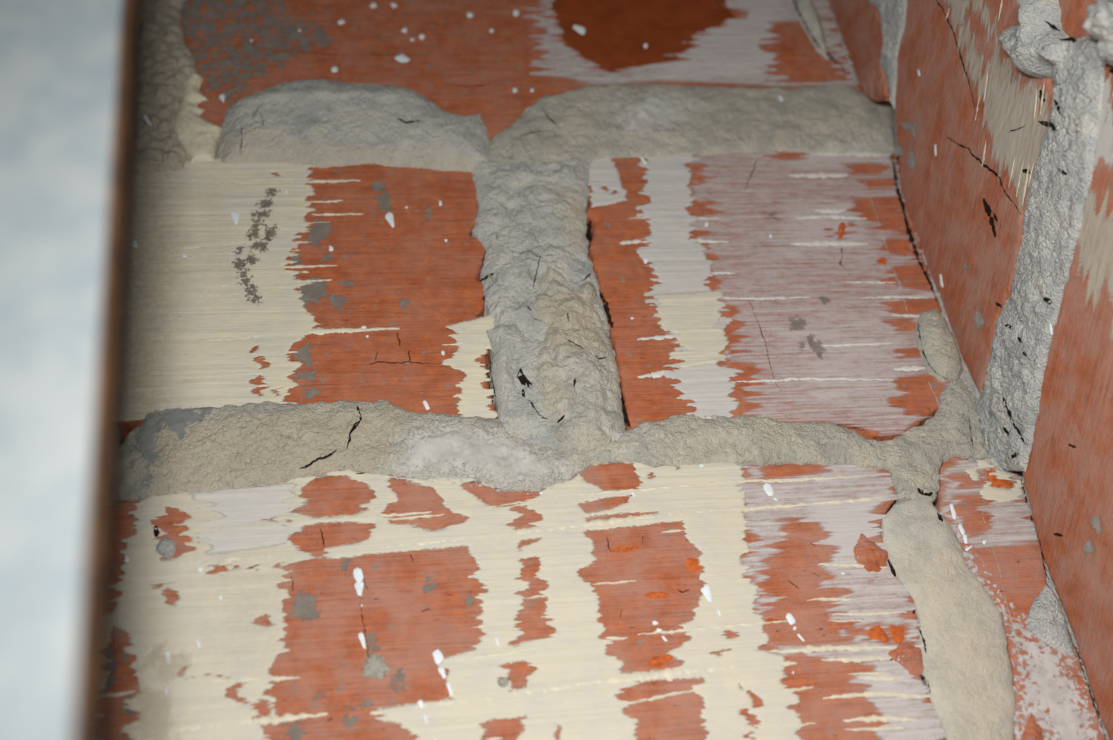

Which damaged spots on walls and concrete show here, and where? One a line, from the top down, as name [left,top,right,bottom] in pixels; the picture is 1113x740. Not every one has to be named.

peeling [549,0,736,73]
crack [937,0,975,107]
crack [299,406,362,469]
spalling [986,468,1013,489]
spalling [685,558,701,573]
spalling [854,534,888,572]
spalling [648,654,672,667]
spalling [866,625,924,679]
spalling [1021,714,1044,740]